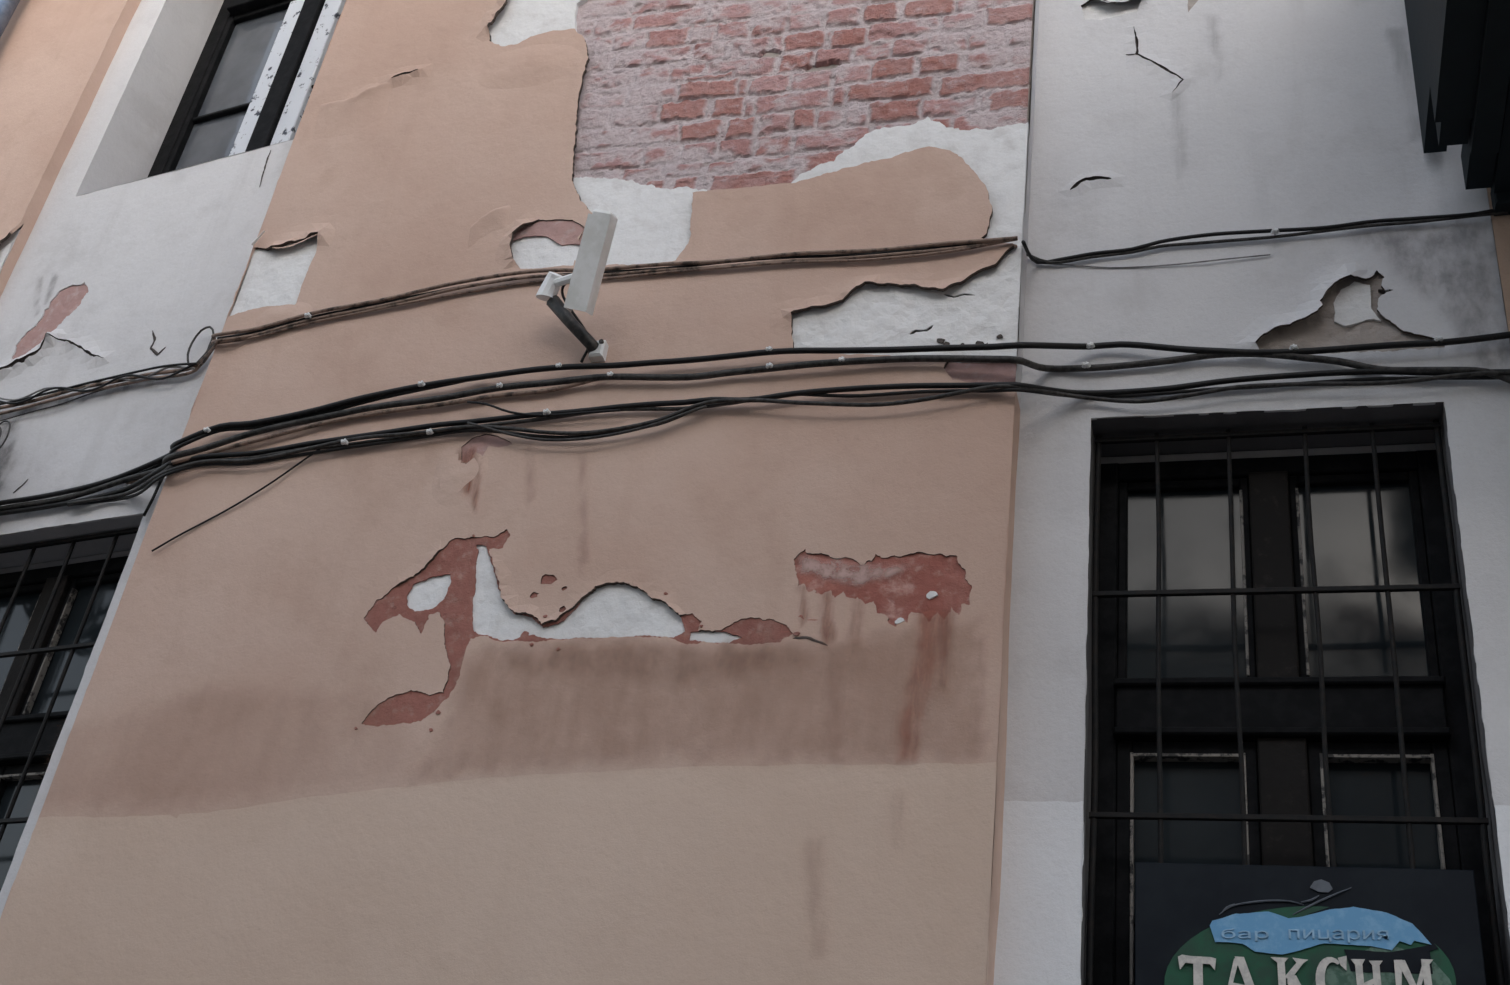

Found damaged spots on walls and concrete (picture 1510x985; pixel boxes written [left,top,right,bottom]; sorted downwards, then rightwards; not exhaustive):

spalling [1082,0,1141,20]
crack [1126,30,1183,87]
flaking render [489,0,1033,382]
peeling [0,229,20,272]
peeling [229,231,317,316]
peeling [12,283,89,359]
spalling [1256,272,1444,355]
peeling [794,550,972,627]
peeling [354,530,828,732]